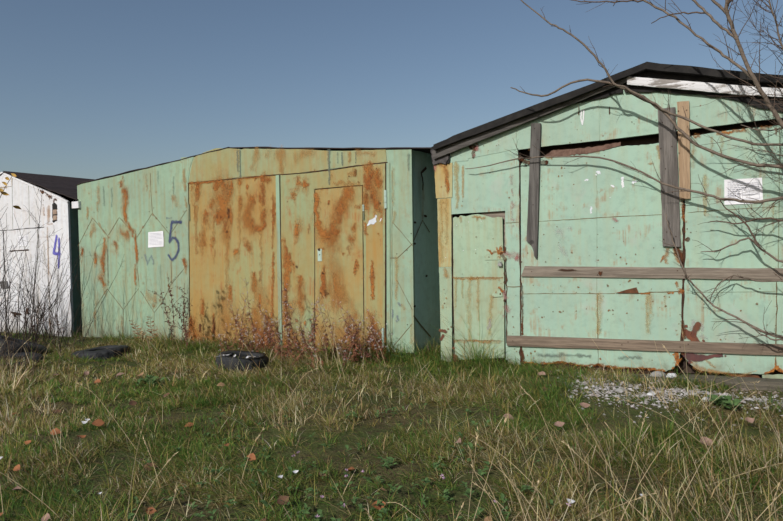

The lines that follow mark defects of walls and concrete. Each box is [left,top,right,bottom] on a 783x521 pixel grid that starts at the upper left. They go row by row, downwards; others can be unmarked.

corrosion [120,178,143,285]
corrosion [187,286,231,344]
corrosion [183,174,276,256]
corrosion [226,240,306,350]
corrosion [313,162,386,354]
corrosion [676,322,705,342]